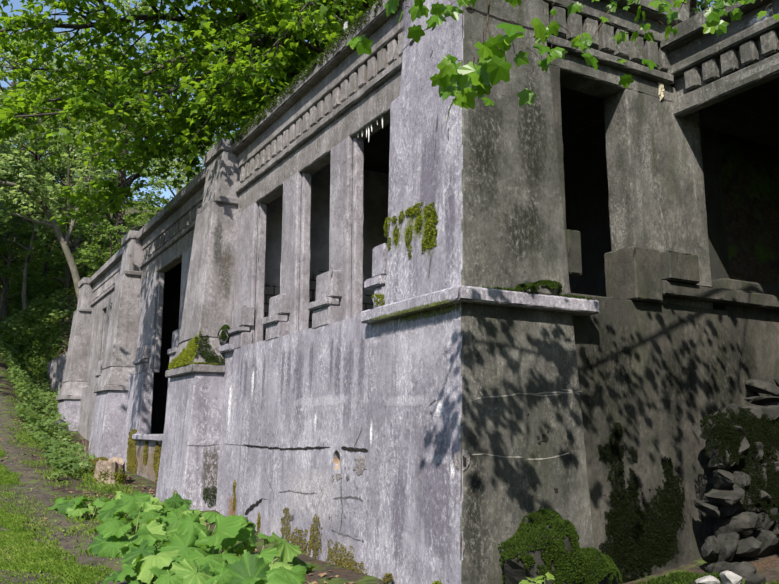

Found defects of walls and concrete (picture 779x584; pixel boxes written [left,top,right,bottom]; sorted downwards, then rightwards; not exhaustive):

damp [228,358,265,424]
damp [281,350,313,406]
damp [330,340,364,411]
crack [469,389,581,402]
crack [188,428,368,452]
crack [470,452,568,460]
crack [245,469,364,541]
flaking render [270,456,367,536]
damp [393,476,405,549]
damp [420,432,455,555]